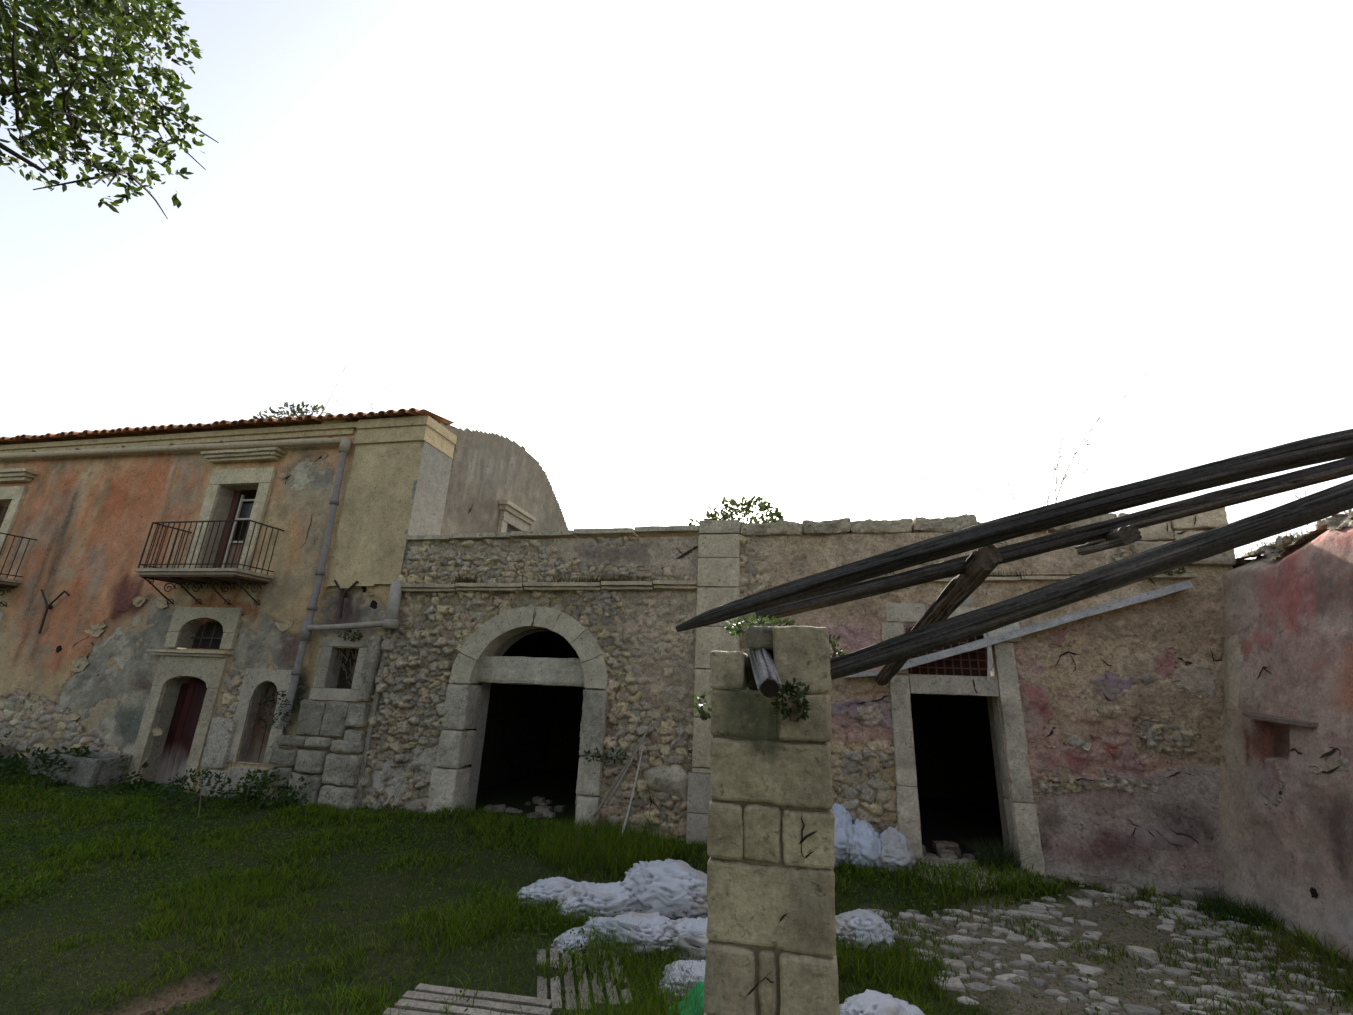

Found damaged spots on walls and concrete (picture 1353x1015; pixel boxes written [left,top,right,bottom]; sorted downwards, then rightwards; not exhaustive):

flaking render [0,596,175,766]
crack [1055,651,1112,701]
flaking render [831,698,898,835]
crack [1288,747,1340,774]